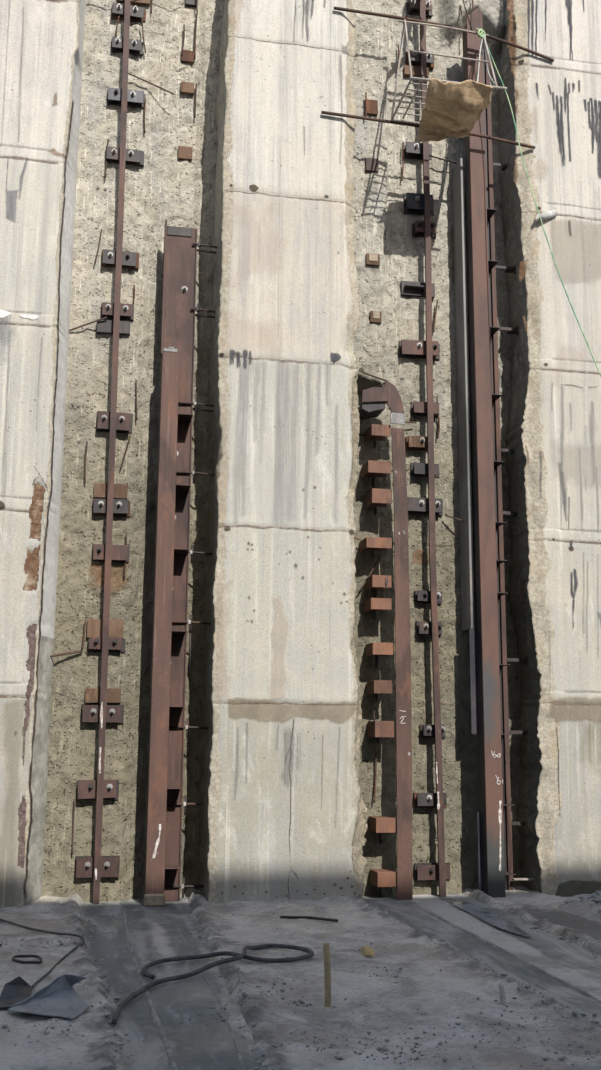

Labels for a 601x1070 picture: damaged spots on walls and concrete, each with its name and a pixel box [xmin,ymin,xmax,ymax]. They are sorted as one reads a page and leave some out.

leakage [294,0,326,41]
leakage [528,0,547,57]
leakage [565,0,585,60]
leakage [536,78,601,177]
spalling [350,371,387,492]
leakage [559,462,573,549]
spalling [351,627,377,880]